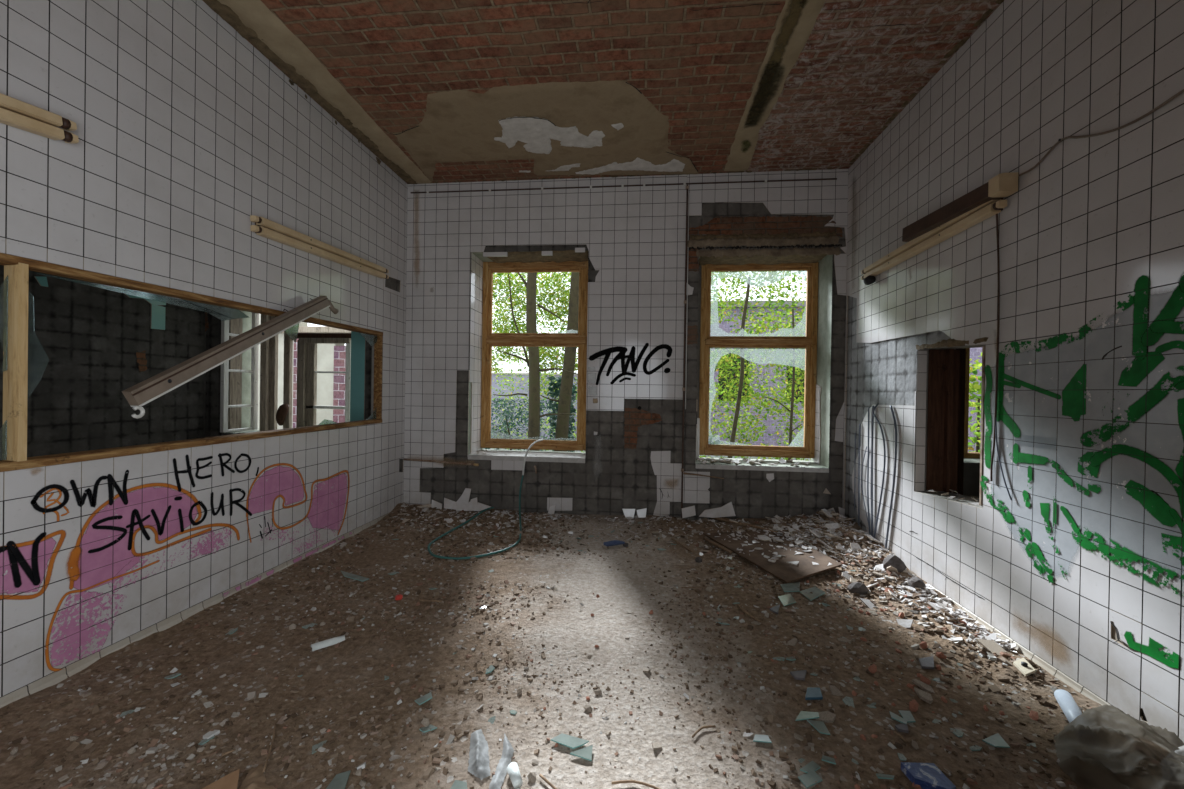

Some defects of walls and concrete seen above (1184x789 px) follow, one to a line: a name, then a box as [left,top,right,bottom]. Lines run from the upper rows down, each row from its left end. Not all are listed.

peeling [494,117,624,154]
peeling [481,157,688,182]
spalling [420,203,957,532]